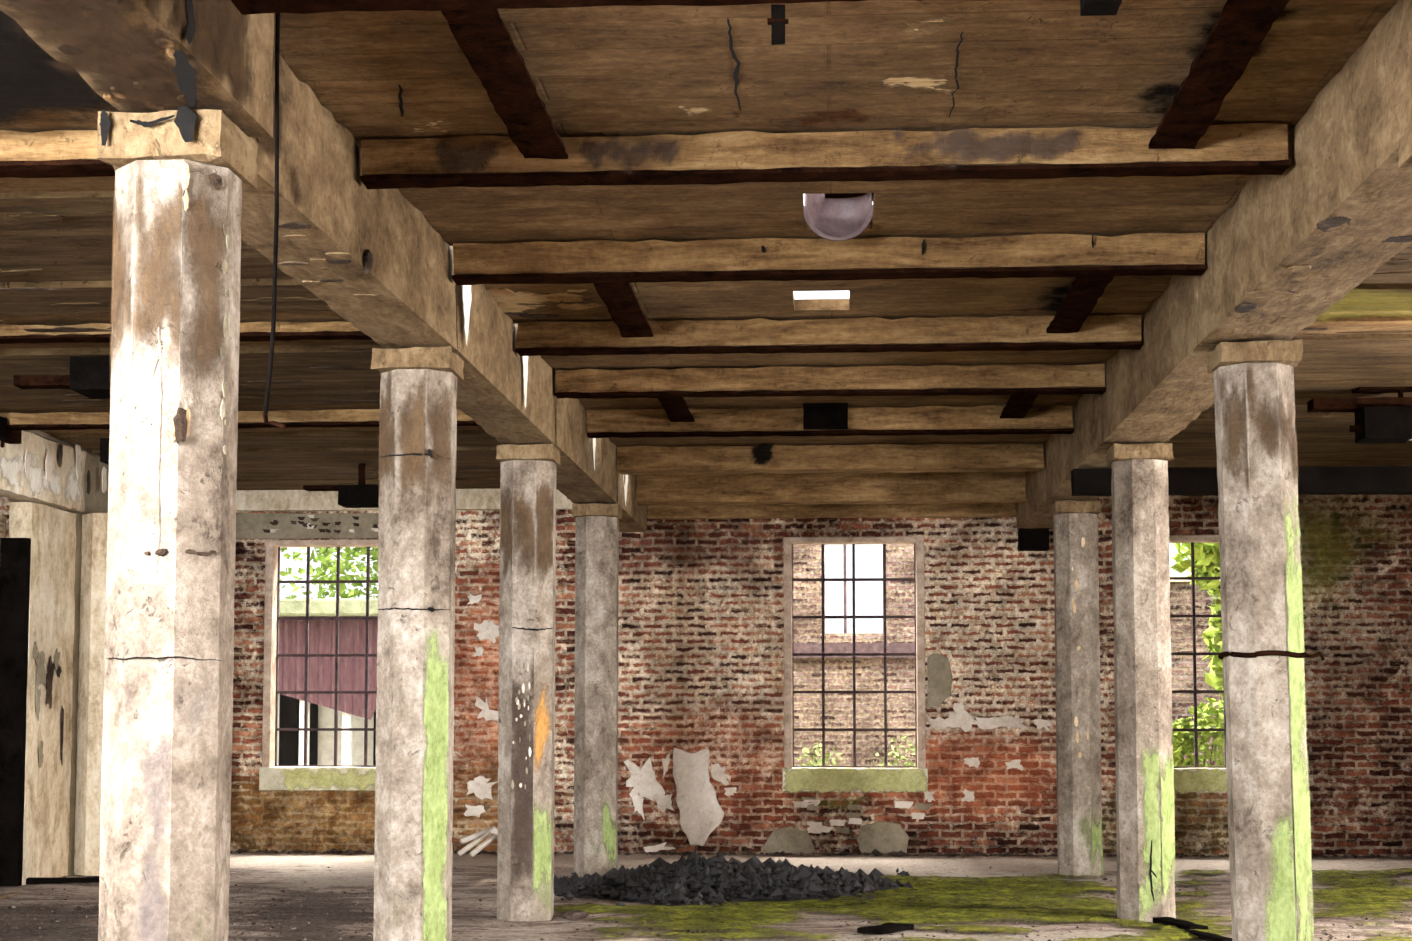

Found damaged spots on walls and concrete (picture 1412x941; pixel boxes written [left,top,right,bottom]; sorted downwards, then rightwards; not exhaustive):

crack [727,19,741,111]
crack [949,31,963,117]
damp [1317,291,1412,319]
damp [422,633,449,941]
corrosion [534,691,550,767]
peeling [624,748,737,852]
peeling [764,791,936,854]
peeling [961,789,975,802]
peeling [964,757,980,768]
peeling [927,653,1051,732]
peeling [1005,759,1024,771]
damp [1161,757,1175,895]